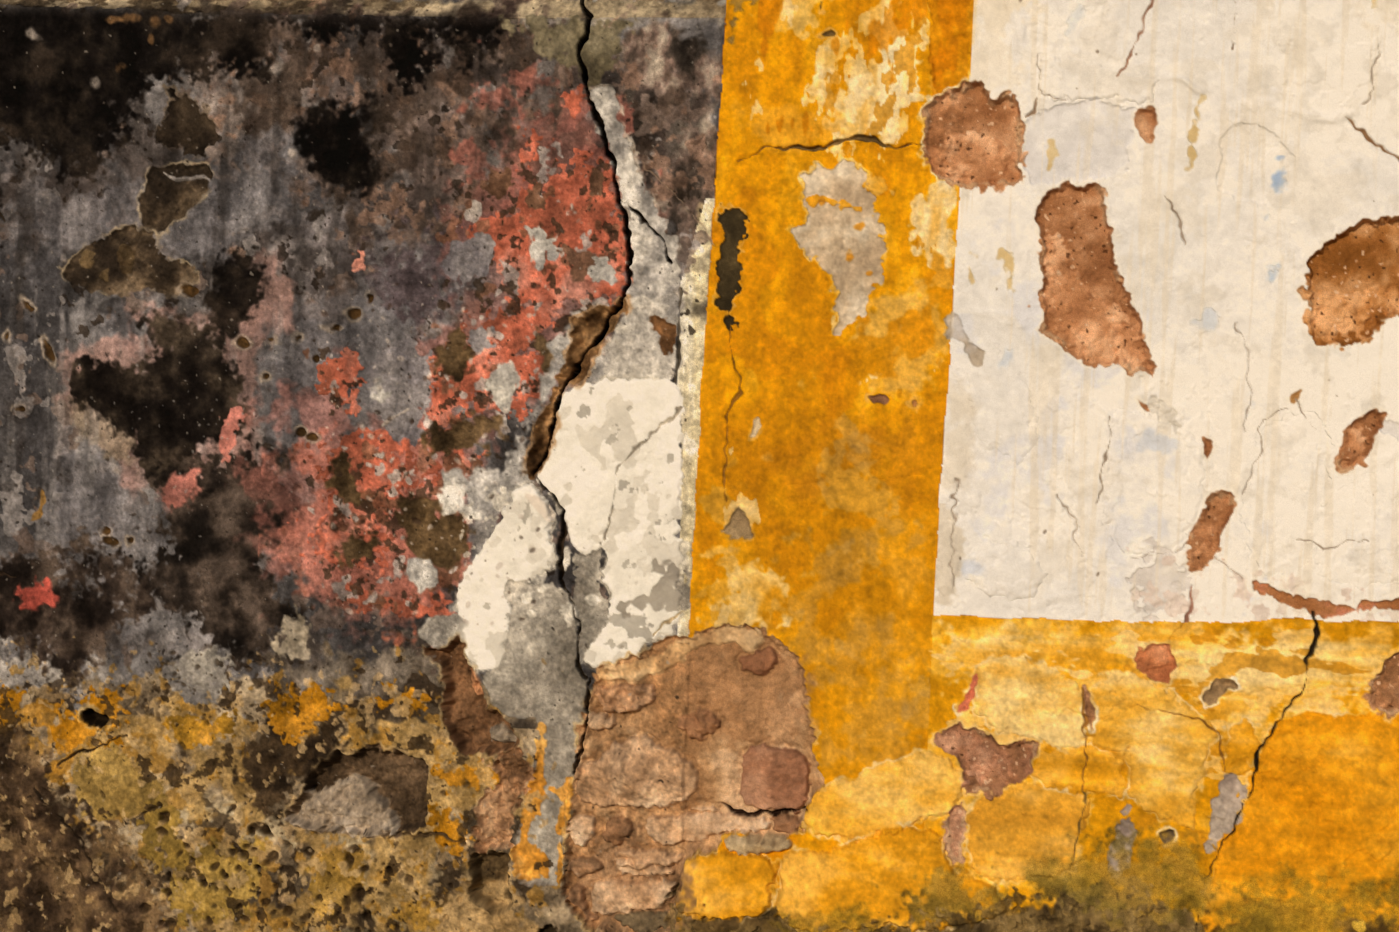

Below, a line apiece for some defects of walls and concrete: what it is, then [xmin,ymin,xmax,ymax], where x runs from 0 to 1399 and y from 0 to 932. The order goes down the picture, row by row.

flaking render [63,88,220,299]
crack [737,134,925,163]
peeling [791,160,895,336]
flaking render [922,0,1159,377]
flaking render [1297,216,1399,352]
crack [524,0,716,778]
crack [1234,322,1317,496]
flaking render [284,126,825,932]
crack [1296,539,1371,553]
water stain [0,725,178,932]
water stain [227,718,352,827]
crack [1135,611,1322,877]